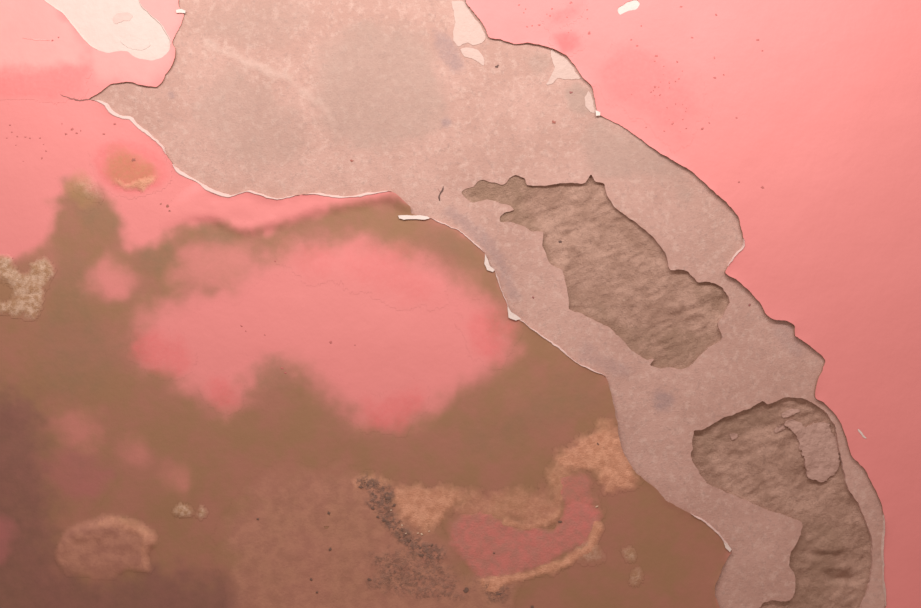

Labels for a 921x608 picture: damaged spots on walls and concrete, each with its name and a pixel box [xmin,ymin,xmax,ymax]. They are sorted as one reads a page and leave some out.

peeling [44,0,171,60]
peeling [241,0,486,82]
peeling [546,49,580,85]
peeling [618,0,640,15]
peeling [95,100,166,154]
peeling [584,91,600,116]
peeling [173,164,237,197]
spalling [462,175,730,369]
water stain [0,135,732,608]
spalling [443,470,607,578]
spalling [691,397,873,608]